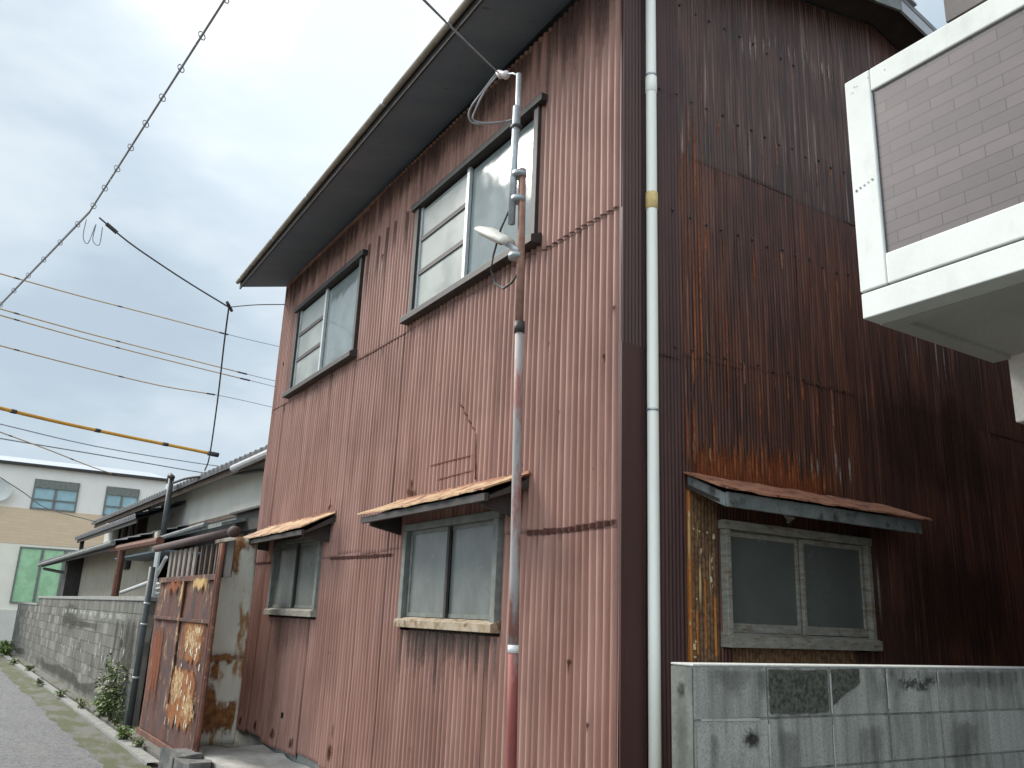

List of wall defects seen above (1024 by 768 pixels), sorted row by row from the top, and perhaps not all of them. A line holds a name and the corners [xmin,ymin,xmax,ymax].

corrosion [684,221,746,404]
corrosion [686,412,843,496]
corrosion [232,536,254,572]
corrosion [147,630,163,700]
corrosion [202,653,257,734]
damp [745,733,759,748]